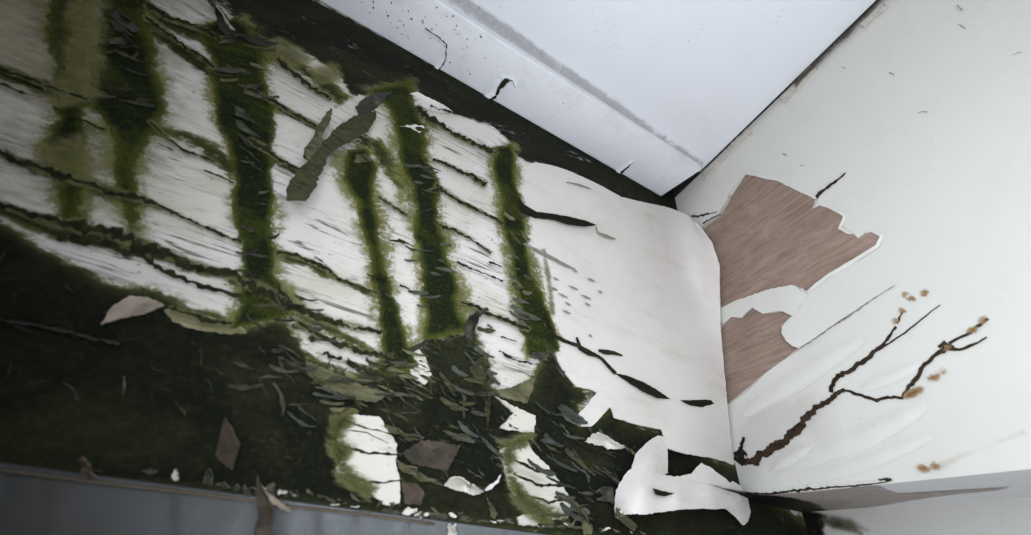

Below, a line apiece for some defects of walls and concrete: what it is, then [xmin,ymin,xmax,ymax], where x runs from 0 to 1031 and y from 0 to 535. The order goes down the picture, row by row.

crack [0,146,242,244]
peeling [286,91,392,201]
peeling [410,92,451,114]
damp [222,0,678,211]
crack [415,105,504,282]
peeling [101,296,164,325]
crack [0,196,410,384]
damp [0,221,862,535]
peeling [384,307,535,519]
crack [460,243,623,375]
peeling [504,162,892,535]
crack [734,305,989,495]